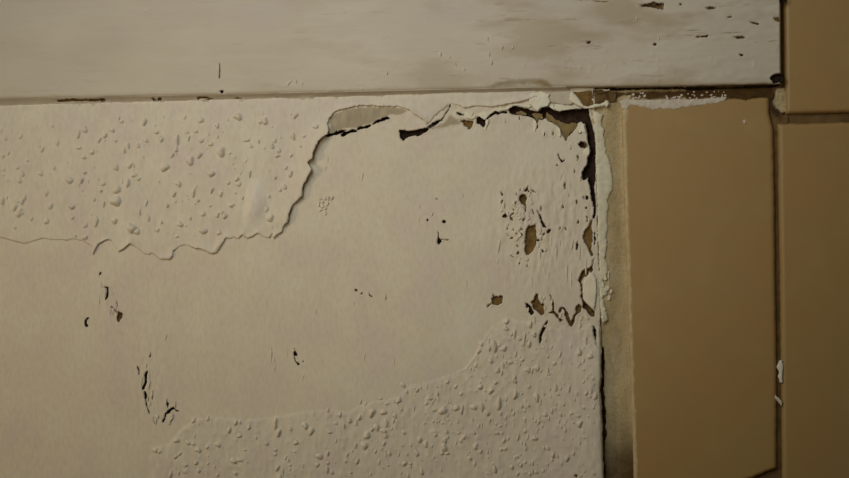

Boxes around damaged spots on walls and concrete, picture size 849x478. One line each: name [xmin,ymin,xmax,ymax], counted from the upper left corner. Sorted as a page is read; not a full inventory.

peeling [442,89,616,136]
peeling [577,122,590,157]
peeling [499,186,547,261]
spalling [583,219,596,256]
spalling [526,294,565,325]
peeling [578,273,597,330]